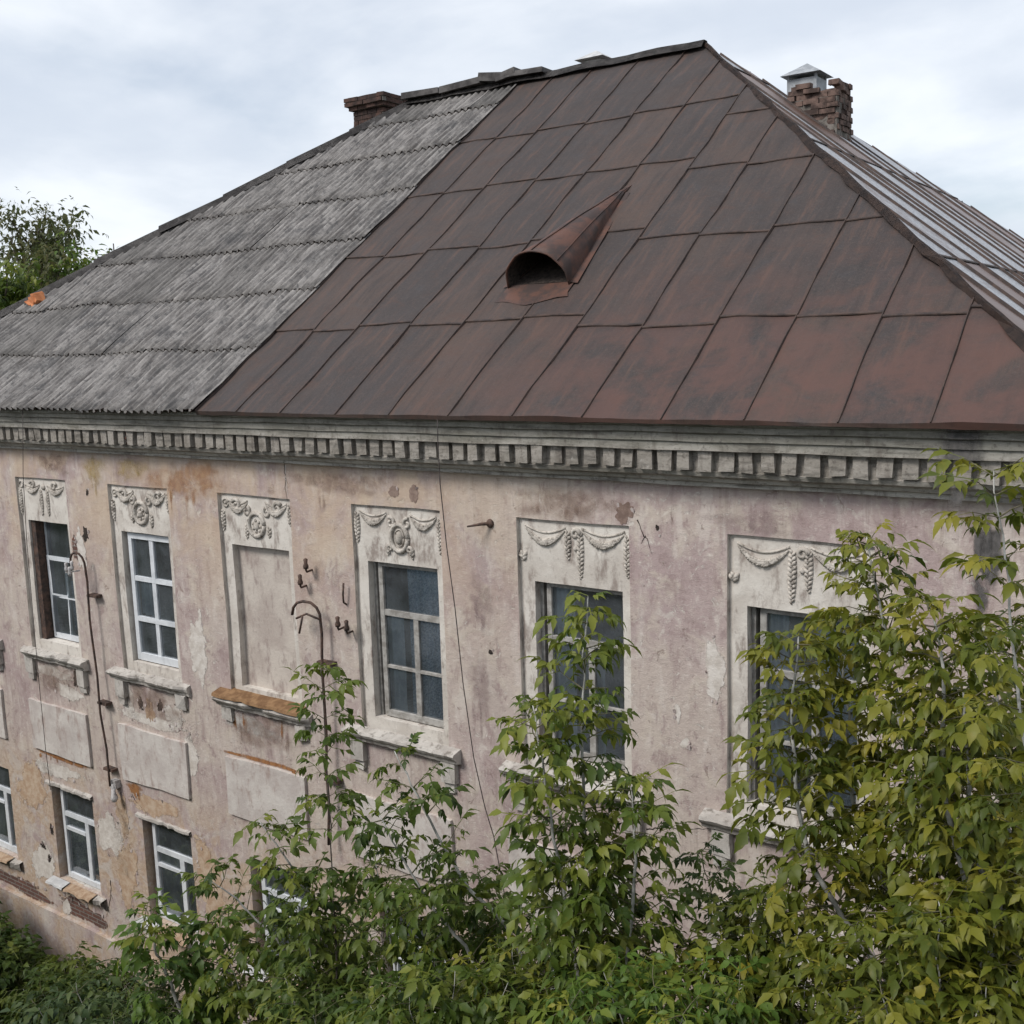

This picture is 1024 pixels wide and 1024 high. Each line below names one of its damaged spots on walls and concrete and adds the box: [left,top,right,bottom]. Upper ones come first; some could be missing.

spalling [388,484,418,503]
spalling [615,502,635,525]
peeling [188,609,207,689]
peeling [705,635,726,704]
peeling [97,792,178,857]
flaking render [0,823,108,929]